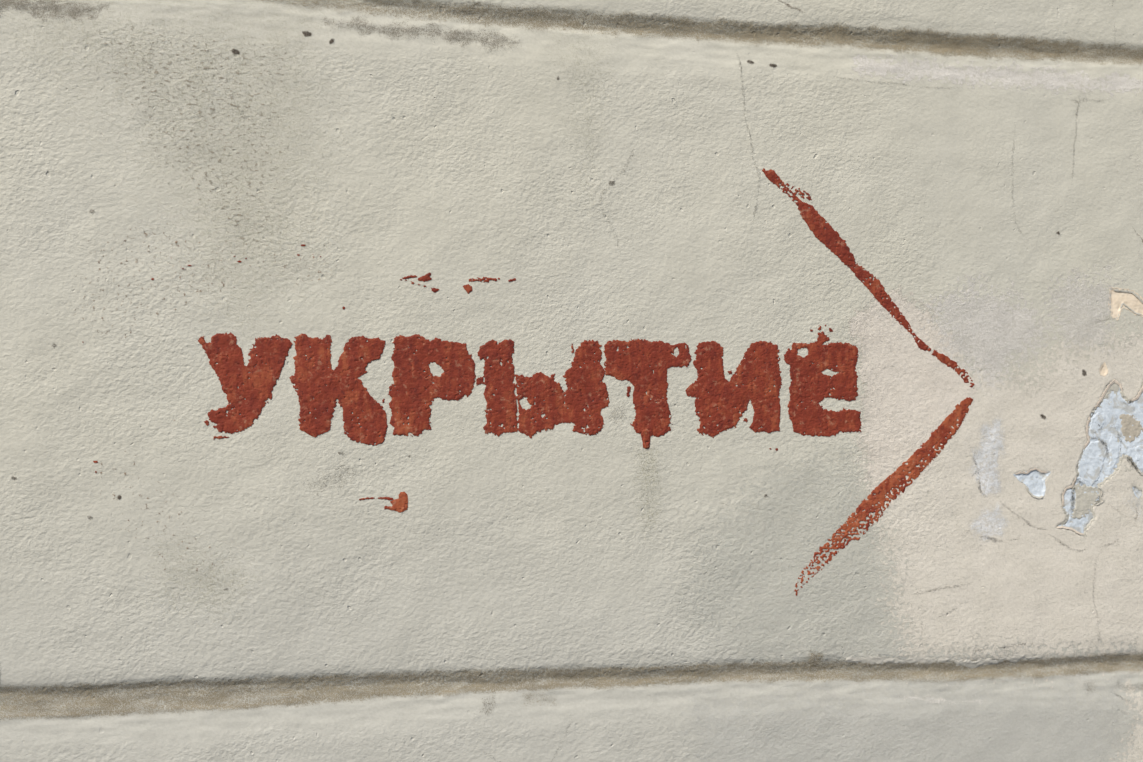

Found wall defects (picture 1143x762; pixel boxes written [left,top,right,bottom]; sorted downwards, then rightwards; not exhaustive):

peeling [1108,287,1143,320]
peeling [1056,362,1143,537]
peeling [1013,468,1051,499]